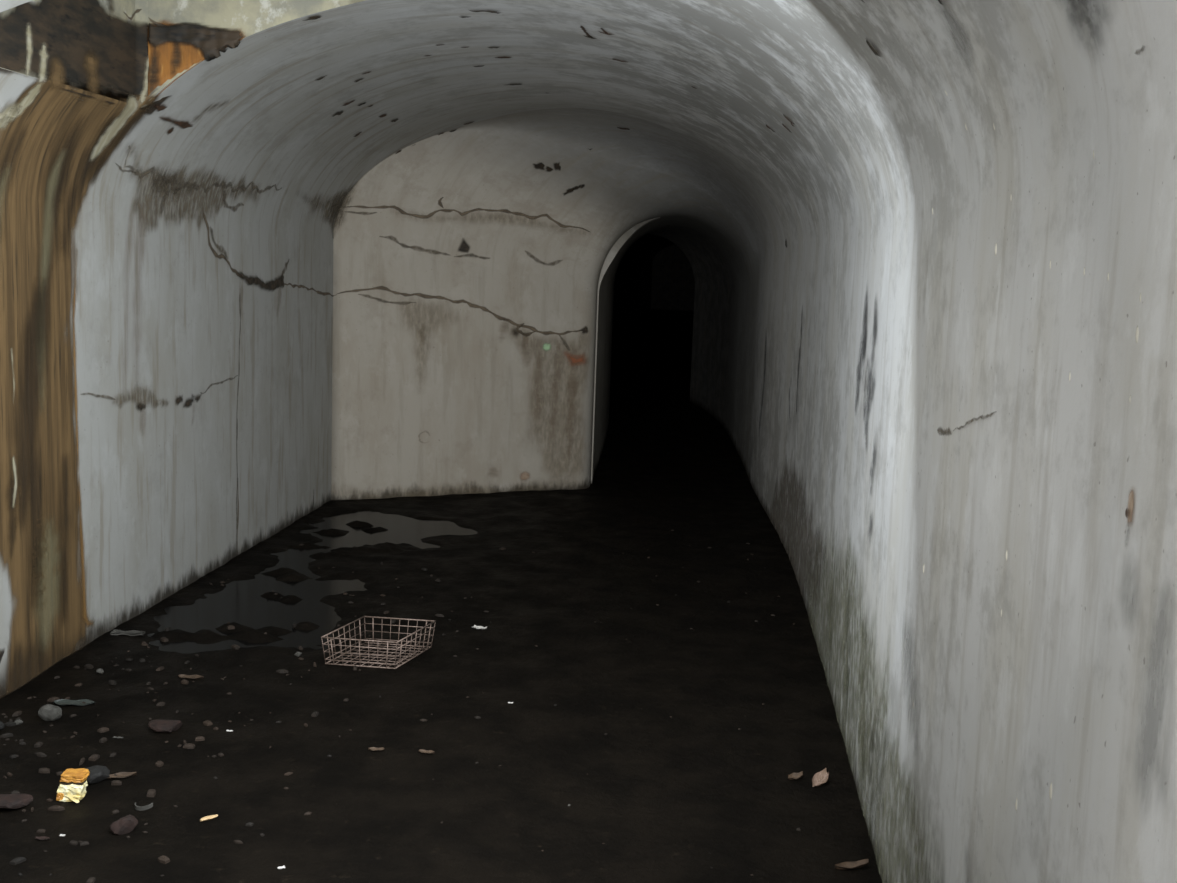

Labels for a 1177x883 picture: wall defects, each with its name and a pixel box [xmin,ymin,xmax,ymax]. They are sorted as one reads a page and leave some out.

crack [202,204,242,278]
crack [343,197,590,259]
crack [527,252,560,265]
crack [284,283,588,351]
rust [0,22,244,699]
crack [937,412,994,434]
rust [1125,491,1134,522]